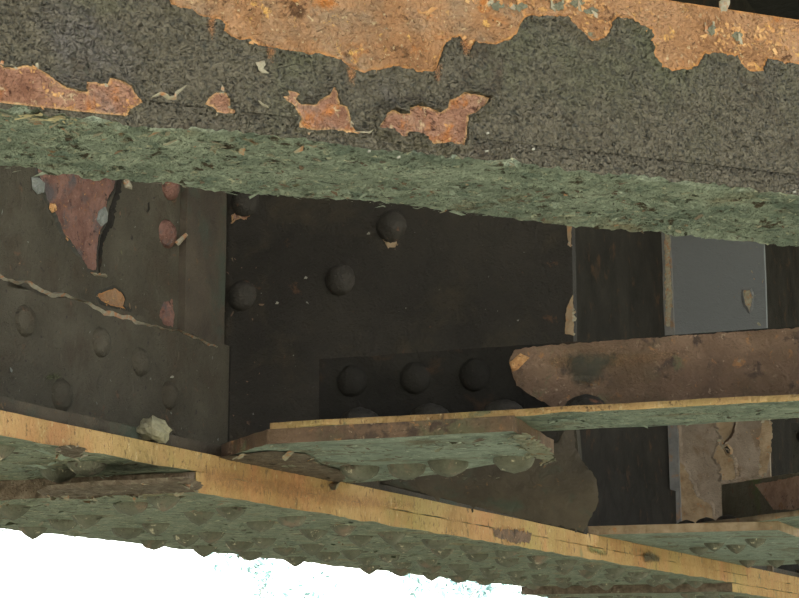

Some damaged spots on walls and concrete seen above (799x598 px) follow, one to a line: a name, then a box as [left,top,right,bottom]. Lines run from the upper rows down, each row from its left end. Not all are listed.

corrosion [162,0,799,81]
corrosion [201,85,241,120]
corrosion [276,82,499,158]
corrosion [35,167,116,273]
corrosion [509,295,799,407]
corrosion [711,422,739,484]